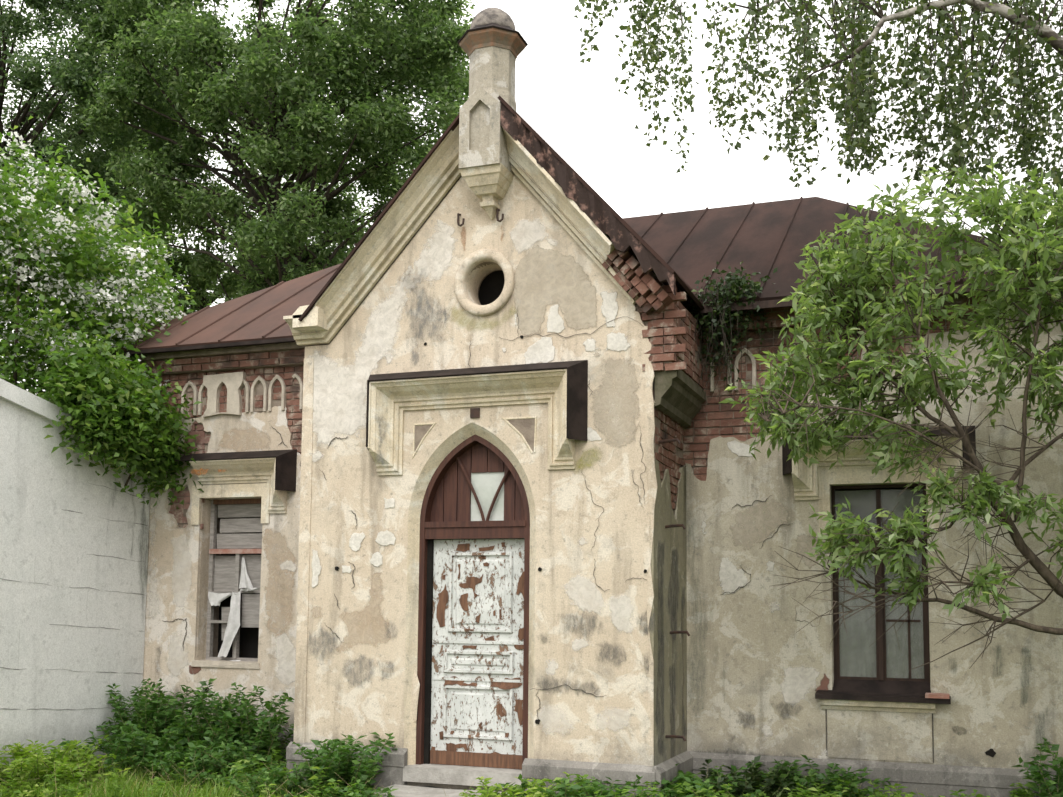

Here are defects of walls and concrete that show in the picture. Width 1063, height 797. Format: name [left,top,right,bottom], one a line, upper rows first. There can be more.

peeling [137,220,456,462]
crack [501,307,638,341]
flaking render [511,219,970,516]
spalling [167,485,205,529]
crack [582,473,653,592]
peeling [337,530,396,651]
peeling [436,542,505,631]
peeling [514,628,524,650]
peeling [444,676,477,687]
peeling [490,677,523,726]
crack [530,684,606,717]
peeling [431,731,469,751]